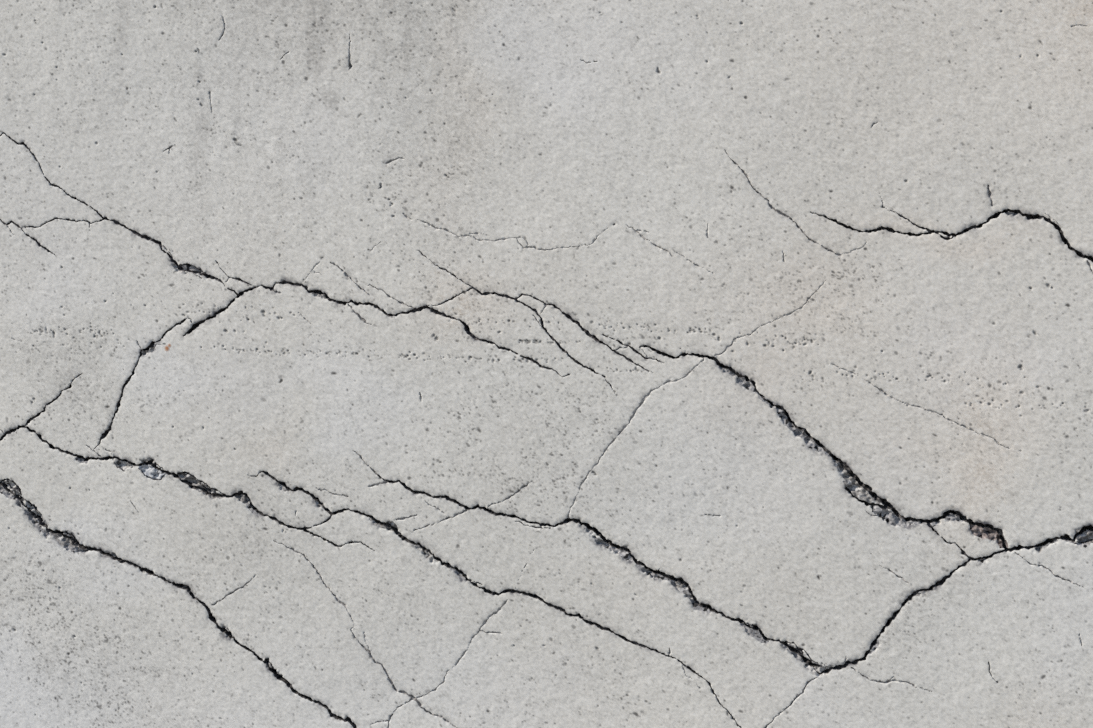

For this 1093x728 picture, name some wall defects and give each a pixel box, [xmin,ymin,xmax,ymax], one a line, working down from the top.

crack [0,133,741,728]
crack [354,280,1093,728]
crack [725,150,1093,273]